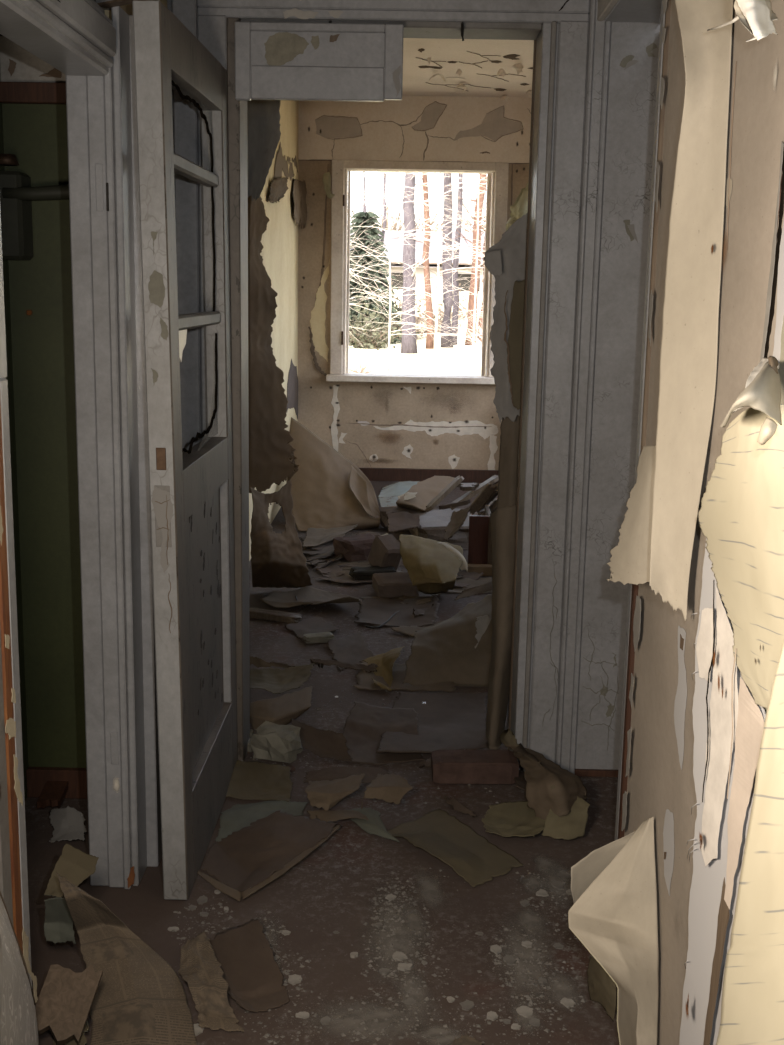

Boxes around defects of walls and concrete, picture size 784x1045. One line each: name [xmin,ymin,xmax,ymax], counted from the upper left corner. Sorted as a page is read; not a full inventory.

peeling [283,8,344,19]
peeling [264,32,340,66]
peeling [315,115,363,139]
crack [361,51,529,217]
peeling [454,54,533,142]
peeling [287,359,298,419]
peeling [331,385,498,470]
peeling [633,596,641,652]